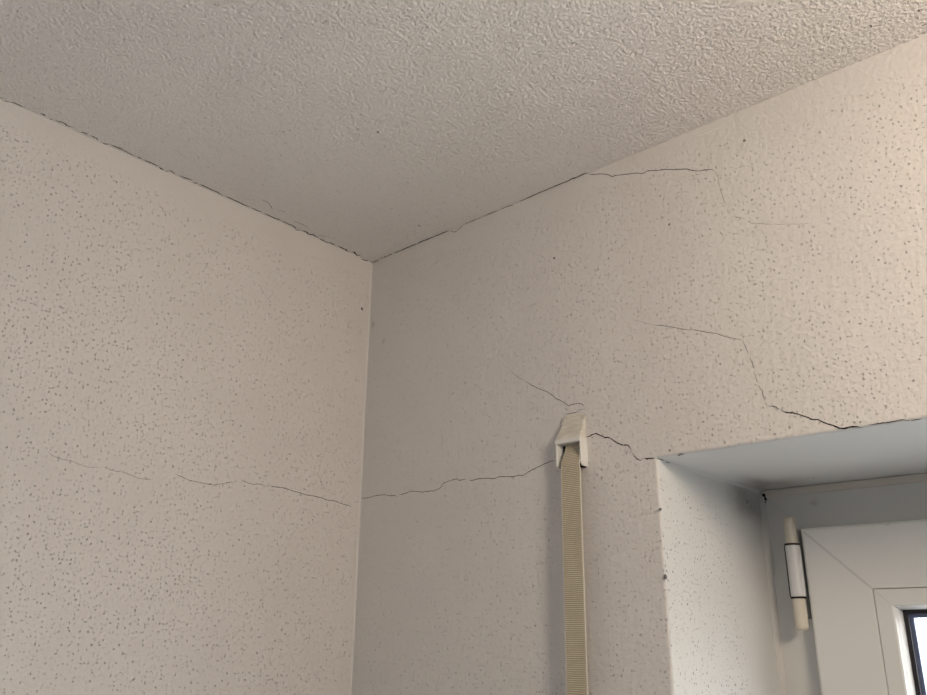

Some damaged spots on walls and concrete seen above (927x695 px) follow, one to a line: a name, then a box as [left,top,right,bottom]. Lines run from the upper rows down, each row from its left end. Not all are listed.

crack [0,97,782,263]
crack [504,366,583,423]
crack [635,320,920,429]
crack [586,433,669,463]
crack [176,460,553,507]